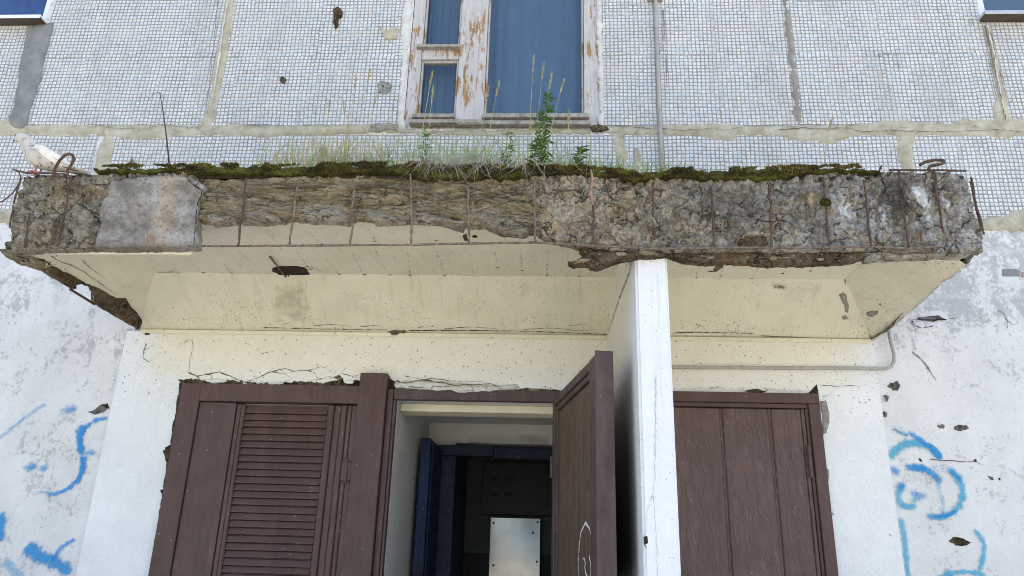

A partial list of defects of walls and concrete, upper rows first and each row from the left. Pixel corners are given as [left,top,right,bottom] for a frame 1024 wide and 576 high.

spalling [333,7,343,29]
spalling [0,147,983,335]
crack [179,339,359,383]
crack [395,376,502,391]
flaking render [883,381,900,417]
flaking render [937,422,969,431]
flaking render [949,537,971,546]